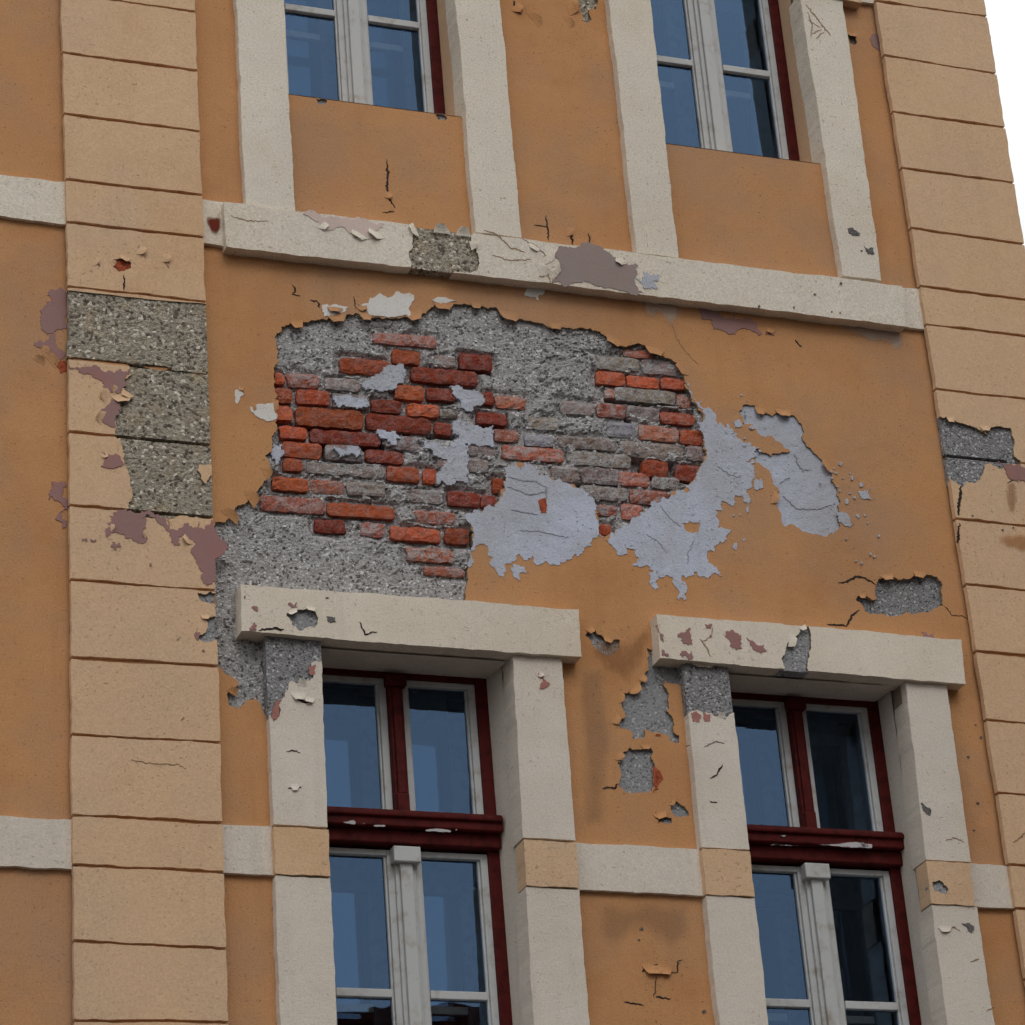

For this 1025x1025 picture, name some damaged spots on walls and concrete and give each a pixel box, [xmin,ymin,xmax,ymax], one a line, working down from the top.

crack [383,159,395,213]
flaking render [408,223,479,278]
flaking render [936,416,1025,487]
flaking render [33,287,871,721]
crack [955,486,963,543]
crack [827,610,859,627]
crack [839,575,876,585]
flaking render [856,570,940,617]
flaking render [611,624,733,793]
crack [625,960,681,1006]